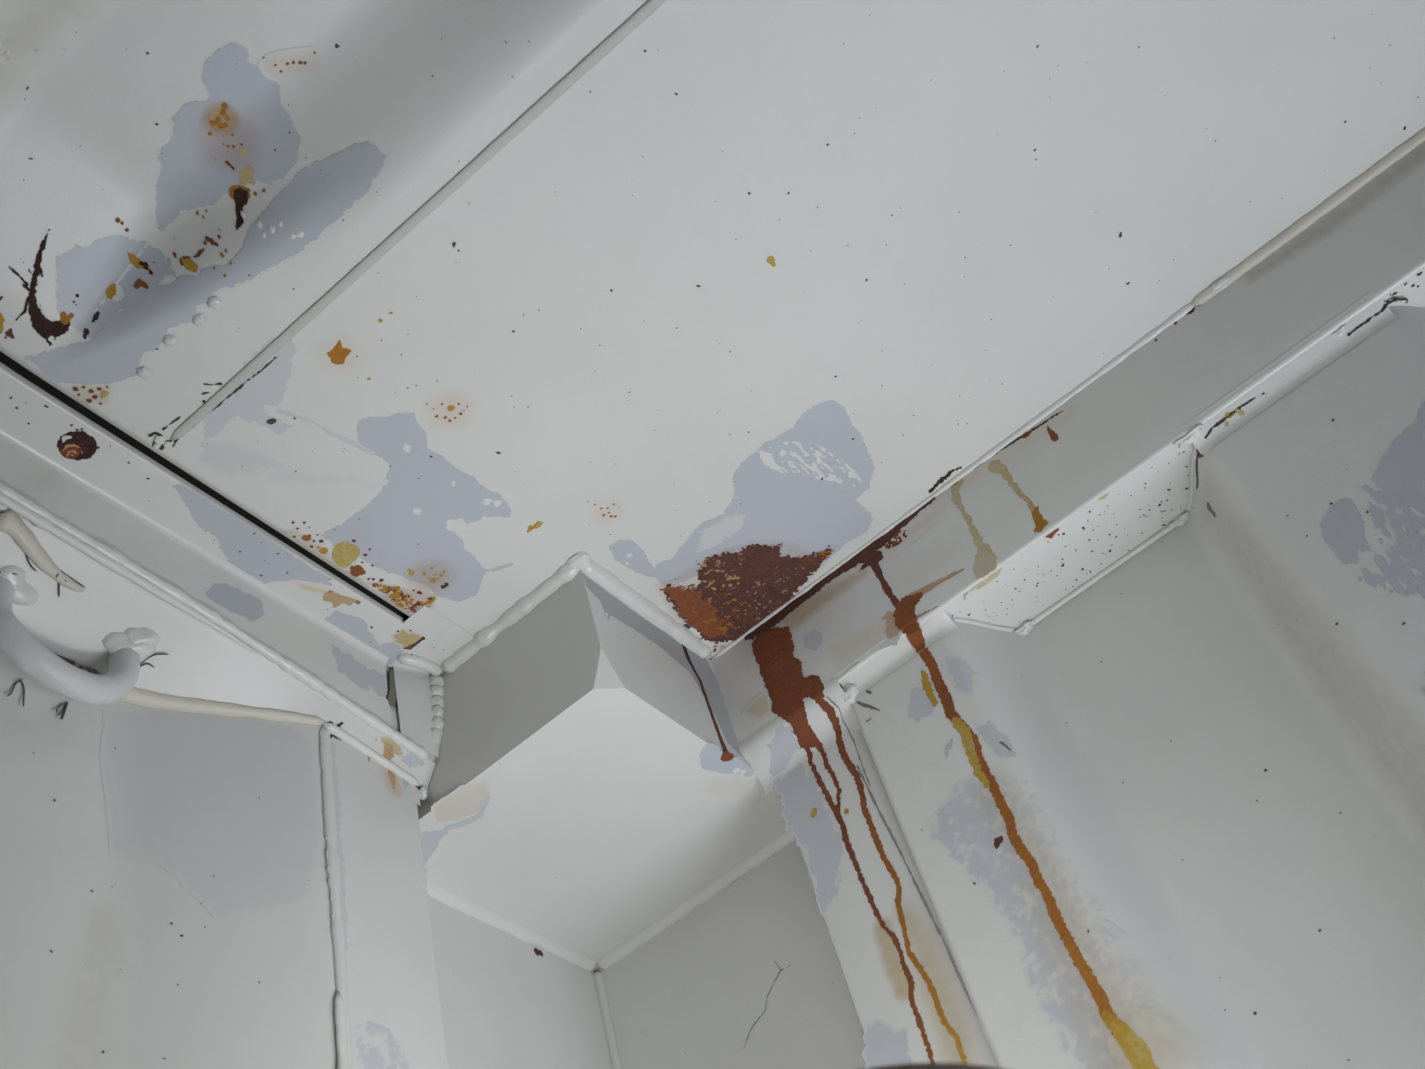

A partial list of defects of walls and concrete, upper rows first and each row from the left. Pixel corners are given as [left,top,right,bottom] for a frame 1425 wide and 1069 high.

corrosion [208,102,234,148]
peeling [24,42,386,385]
corrosion [105,252,154,302]
corrosion [173,235,232,277]
corrosion [0,296,15,339]
corrosion [57,428,100,461]
peeling [276,409,513,602]
peeling [609,400,876,585]
peeling [1320,402,1425,599]
corrosion [659,400,1160,1069]
peeling [862,1018,913,1069]